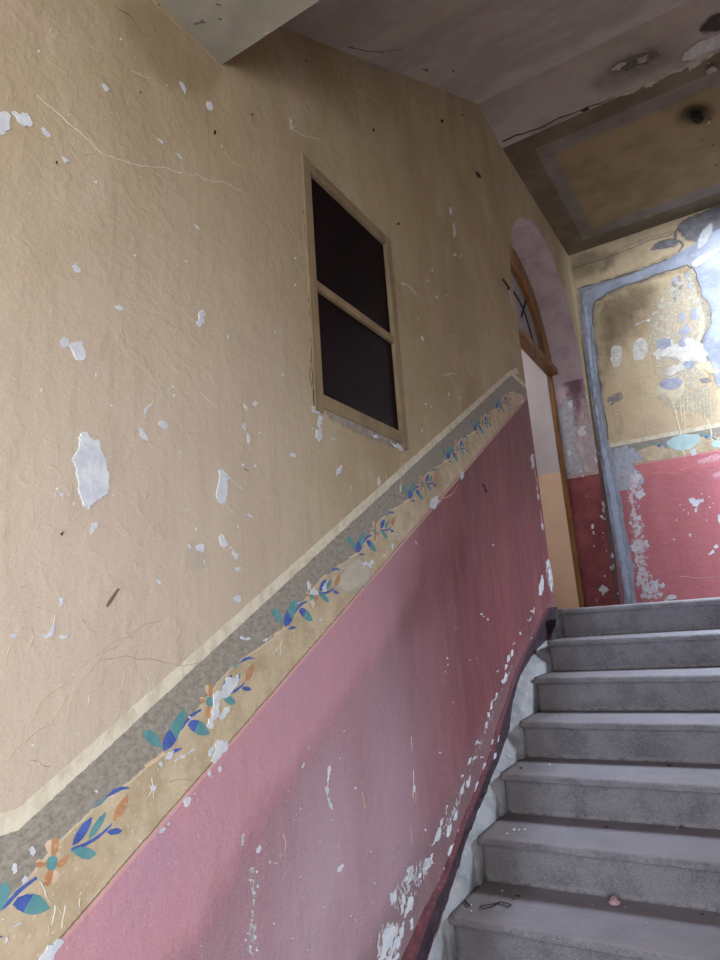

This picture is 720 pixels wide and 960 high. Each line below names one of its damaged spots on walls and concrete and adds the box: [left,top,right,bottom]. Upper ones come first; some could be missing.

peeling [612,33,720,97]
peeling [0,111,51,138]
crack [503,97,614,142]
leakage [682,107,708,122]
peeling [60,336,86,361]
peeling [642,223,720,455]
peeling [311,406,336,441]
peeling [53,432,115,510]
peeling [216,469,243,513]
peeling [207,675,239,729]
peeling [199,739,228,777]
peeling [377,632,547,960]